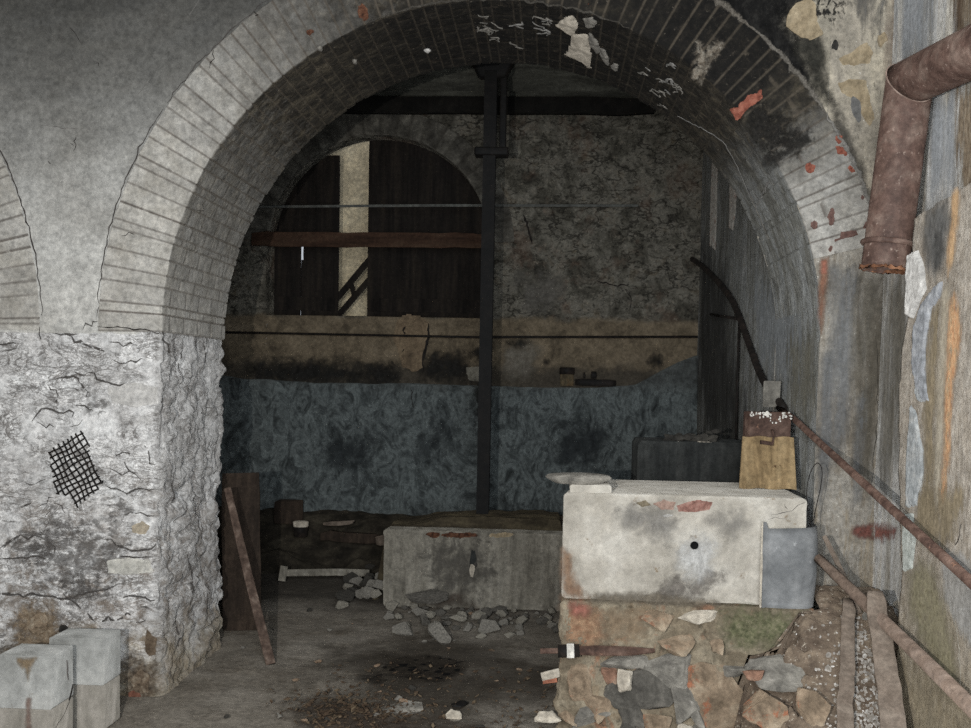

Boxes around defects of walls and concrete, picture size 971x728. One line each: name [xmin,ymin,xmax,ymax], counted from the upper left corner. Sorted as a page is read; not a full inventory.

peeling [477,0,629,71]
spalling [692,41,723,81]
peeling [714,0,875,204]
water stain [798,37,863,178]
corrosion [953,0,971,31]
corrosion [947,85,971,273]
spalling [811,208,867,252]
corrosion [915,289,964,548]
crack [1,479,66,561]
crack [105,445,201,532]
corrosion [853,524,895,540]
crack [0,539,157,623]